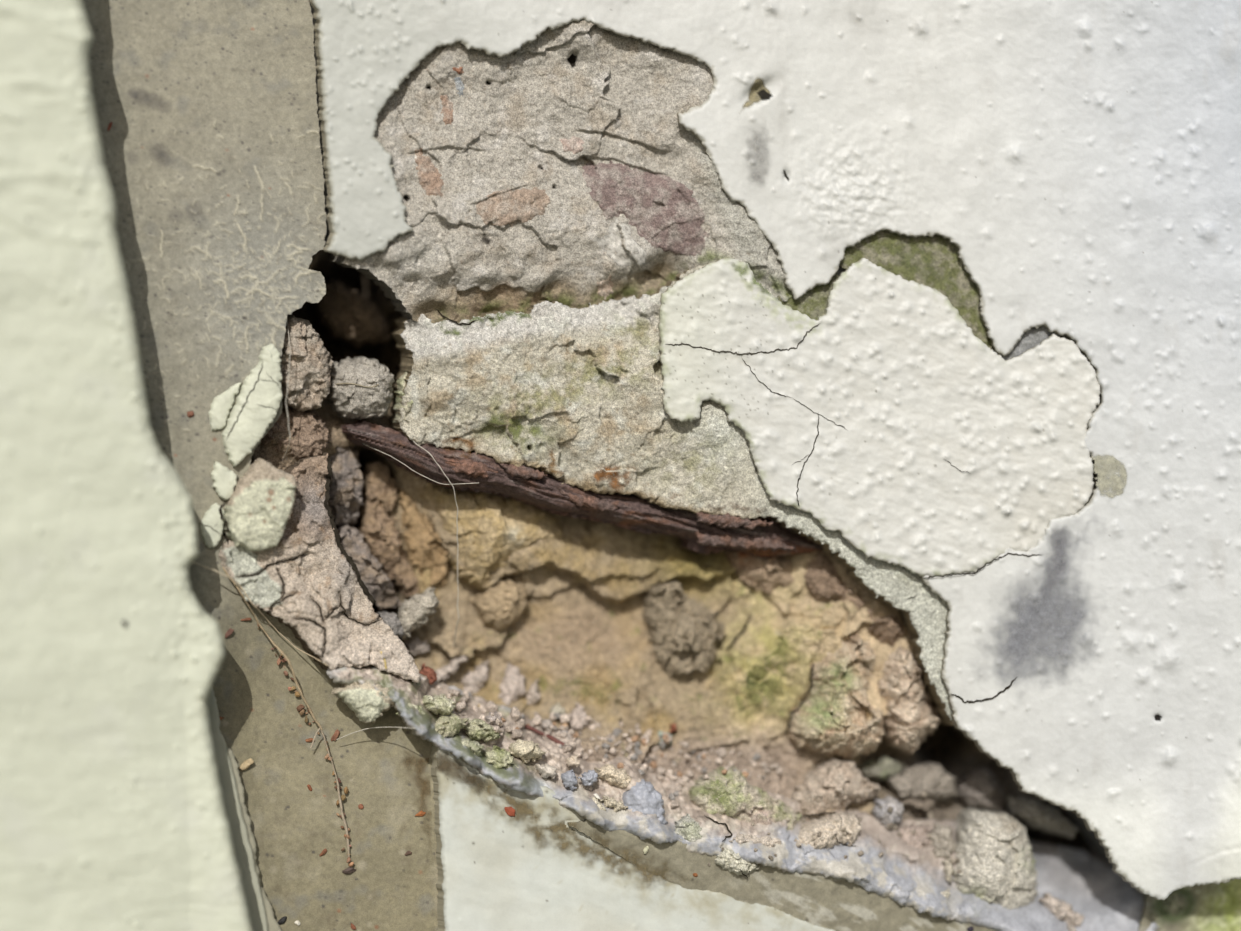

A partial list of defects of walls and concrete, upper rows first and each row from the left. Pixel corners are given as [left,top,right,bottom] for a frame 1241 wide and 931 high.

crack [240,456,381,659]
corrosion [340,420,832,558]
spalling [200,20,1127,868]
crack [668,323,848,505]
leakage [1001,534,1085,673]